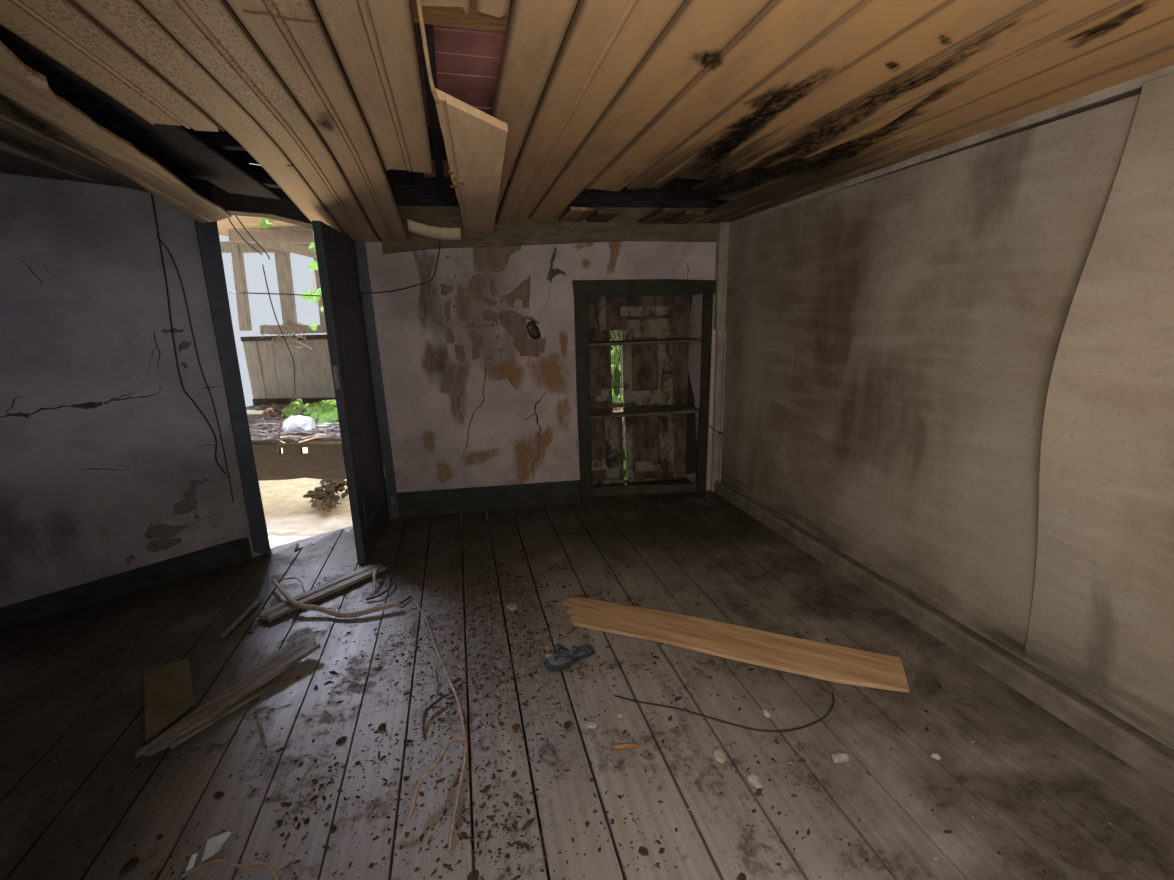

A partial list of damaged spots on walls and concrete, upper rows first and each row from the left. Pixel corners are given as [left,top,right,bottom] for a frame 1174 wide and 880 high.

leakage [1067,4,1144,46]
leakage [669,23,1013,202]
flaking render [426,245,546,364]
flaking render [546,245,566,283]
crack [0,331,162,419]
crack [459,362,487,463]
crack [522,391,548,481]
spalling [123,476,210,565]